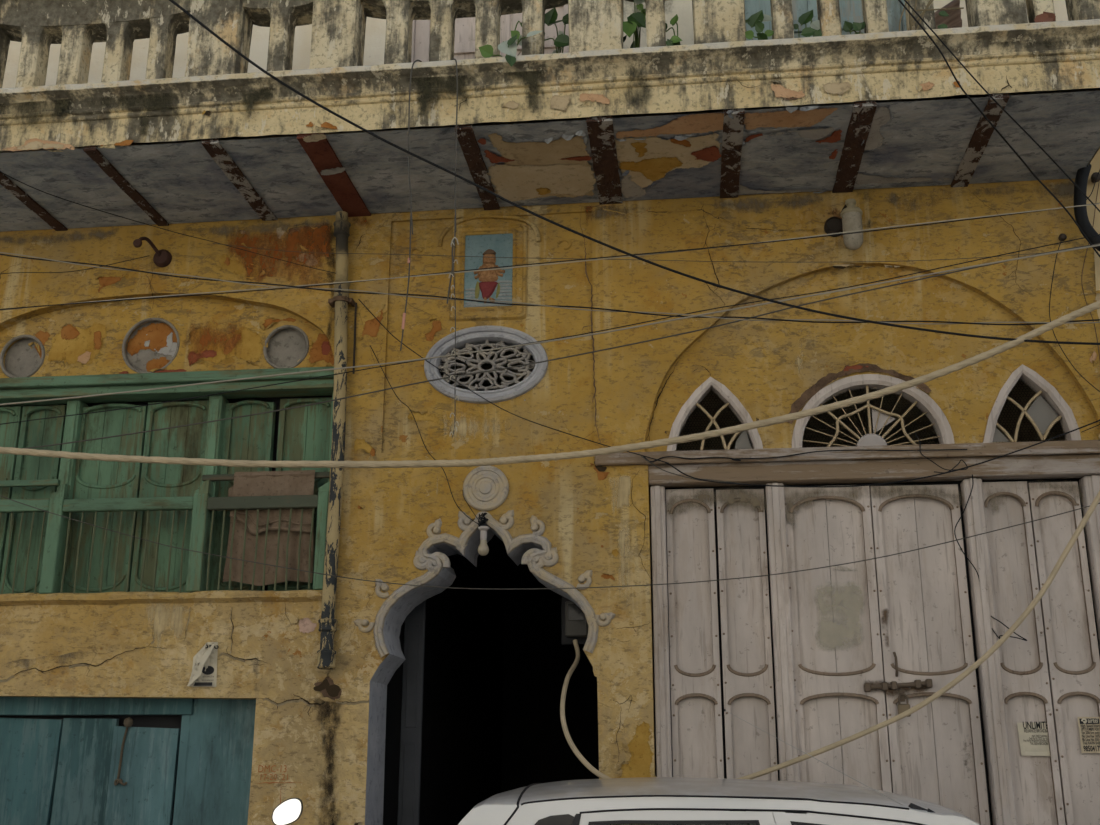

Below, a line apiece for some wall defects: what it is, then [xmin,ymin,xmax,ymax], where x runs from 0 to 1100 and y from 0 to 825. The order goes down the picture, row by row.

flaking render [2,138,75,152]
leakage [140,115,149,135]
peeling [478,131,596,202]
peeling [614,80,842,198]
peeling [126,317,296,373]
peeling [297,333,334,367]
crack [0,609,193,682]
leakage [314,699,340,825]
peeling [617,721,656,778]